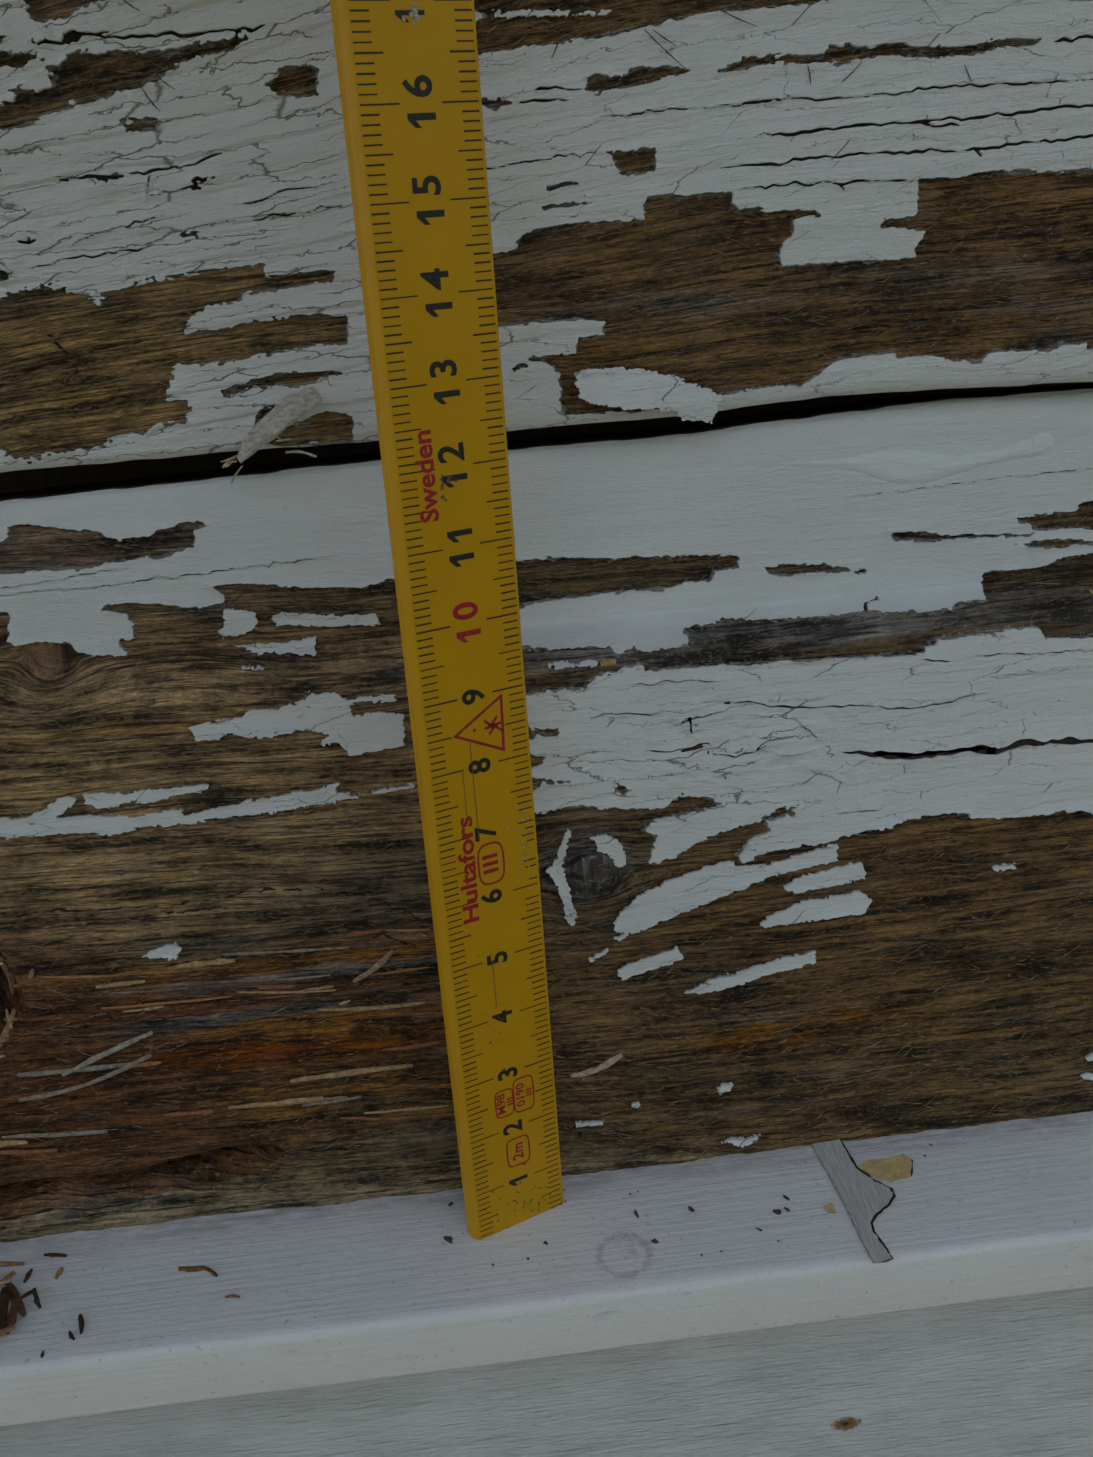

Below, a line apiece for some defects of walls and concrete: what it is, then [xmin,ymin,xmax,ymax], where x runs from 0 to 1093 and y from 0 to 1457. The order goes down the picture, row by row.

peeling [0,0,249,133]
crack [32,25,265,45]
crack [519,86,581,104]
crack [611,79,1093,190]
crack [1054,35,1093,43]
crack [0,153,222,279]
peeling [493,168,1093,424]
peeling [0,263,360,469]
peeling [516,501,1093,695]
crack [596,680,1093,759]
peeling [0,578,463,1243]
peeling [535,783,1093,1263]